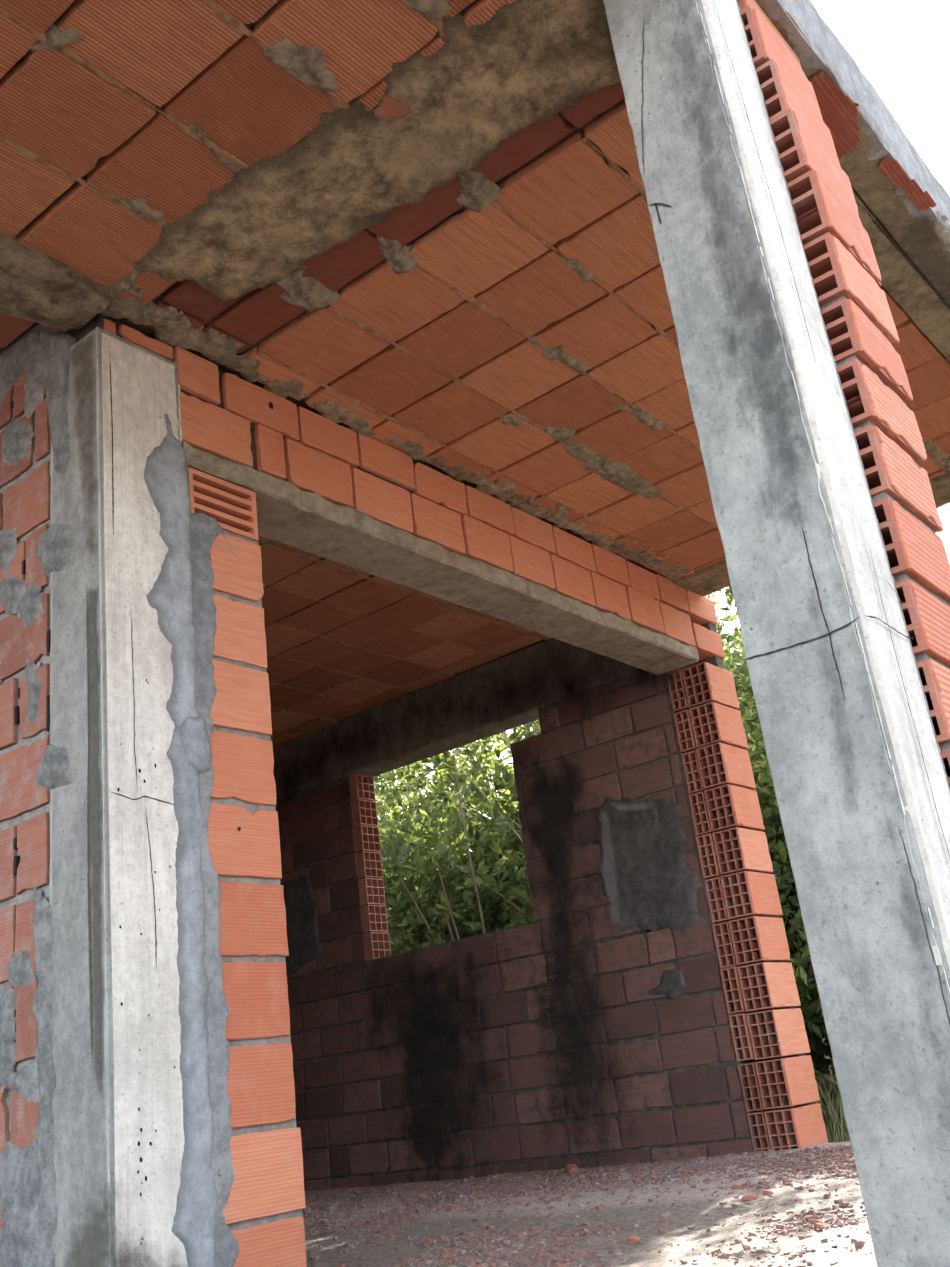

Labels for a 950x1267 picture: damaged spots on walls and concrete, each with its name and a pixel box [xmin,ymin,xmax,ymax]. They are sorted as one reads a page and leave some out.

crack [86,599,175,1068]
damp [372,957,496,1160]
damp [530,762,617,1142]
crack [744,523,950,857]
damp [66,1203,150,1267]